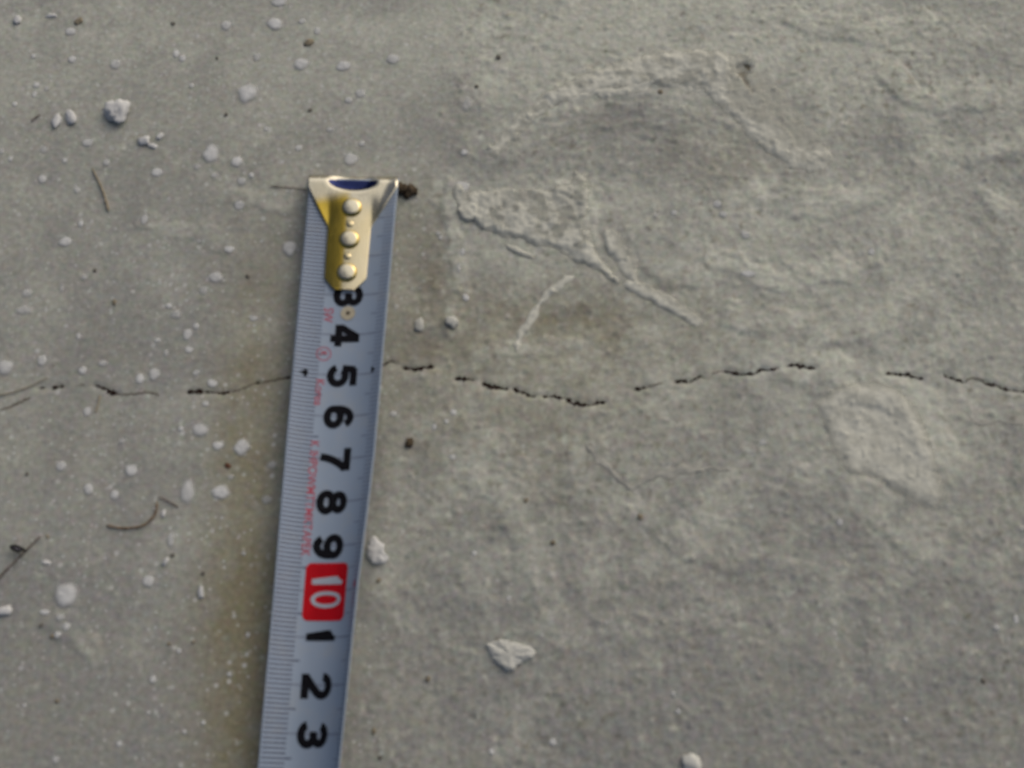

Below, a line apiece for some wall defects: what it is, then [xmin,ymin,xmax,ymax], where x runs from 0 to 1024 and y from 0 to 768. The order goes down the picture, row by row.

crack [1,383,159,410]
crack [187,376,292,395]
crack [382,361,606,407]
crack [635,363,816,391]
crack [886,372,1024,393]